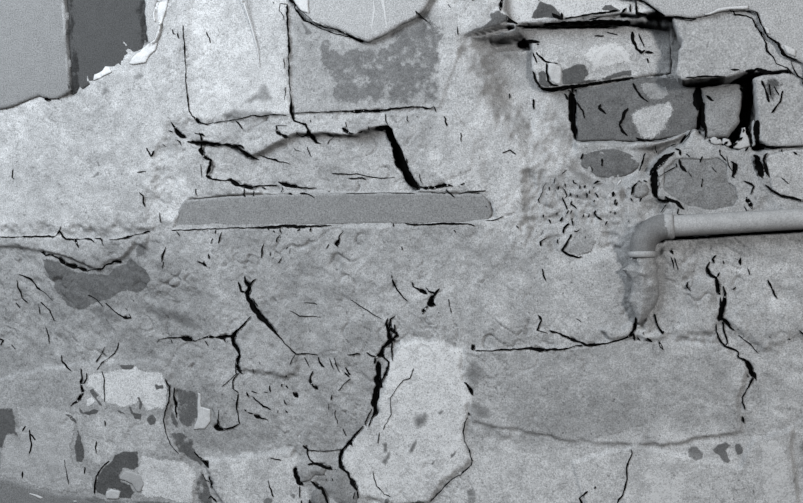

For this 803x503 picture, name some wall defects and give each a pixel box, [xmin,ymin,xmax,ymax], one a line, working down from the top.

peeling [532,1,560,18]
crack [137,0,519,233]
water stain [321,11,444,104]
peeling [538,63,631,87]
crack [499,0,803,215]
spalling [710,120,756,149]
crack [0,192,343,272]
hole [538,170,608,242]
crack [471,314,664,352]
crack [706,255,758,423]
crack [157,276,414,503]
peeling [95,452,144,499]